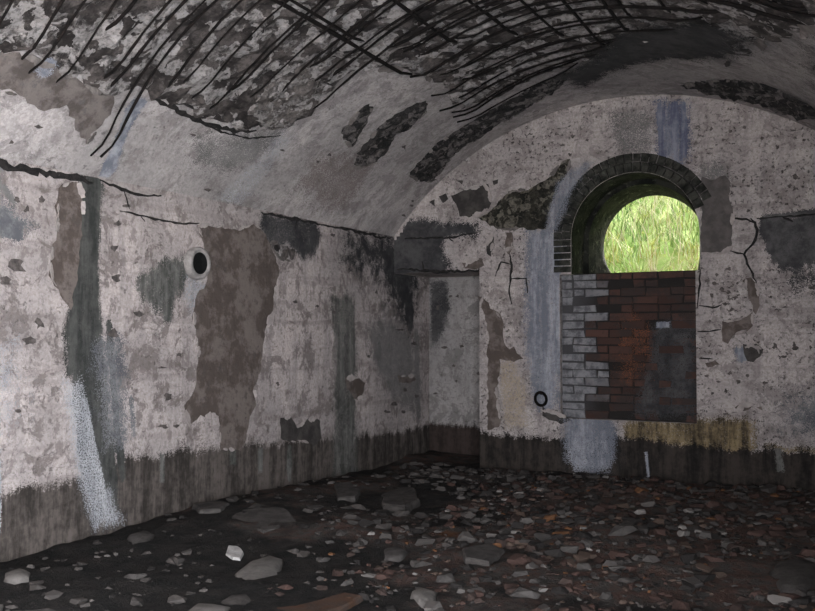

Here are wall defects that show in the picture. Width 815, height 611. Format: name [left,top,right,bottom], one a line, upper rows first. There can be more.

spalling [0,0,815,183]
crack [0,158,199,225]
spalling [430,135,575,270]
crack [731,213,815,283]
flaking render [156,222,295,452]
damp [0,95,815,562]
flaking render [477,296,523,430]